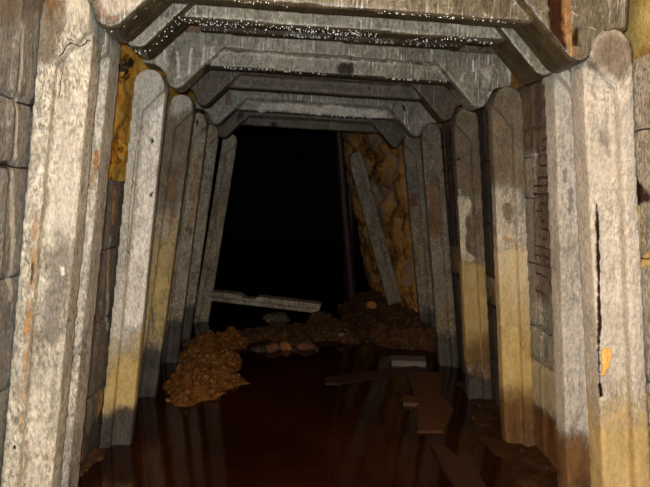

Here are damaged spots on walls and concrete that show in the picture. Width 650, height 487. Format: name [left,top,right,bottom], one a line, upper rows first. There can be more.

rust [547,0,578,50]
crack [58,39,90,101]
water stain [95,0,632,196]